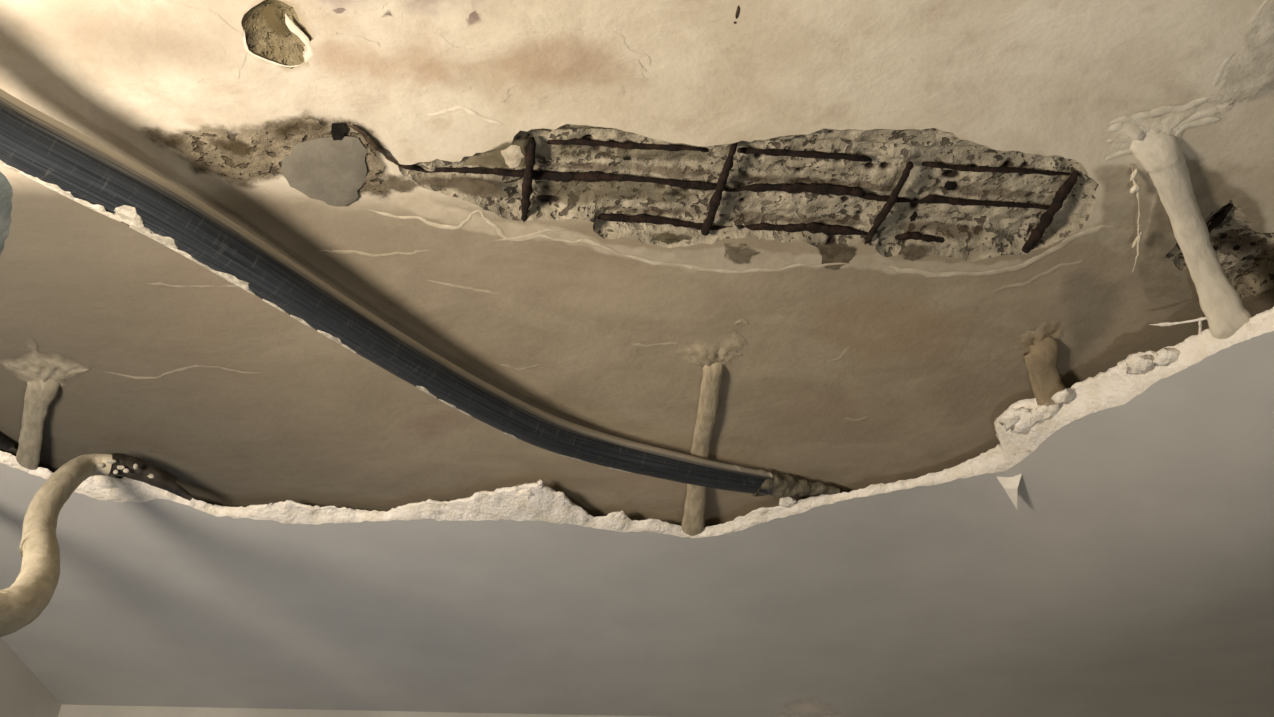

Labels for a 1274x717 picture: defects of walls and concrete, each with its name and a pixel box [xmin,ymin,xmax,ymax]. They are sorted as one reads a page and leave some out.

spalling [241,0,313,69]
spalling [74,115,1274,538]
spalling [0,451,53,480]